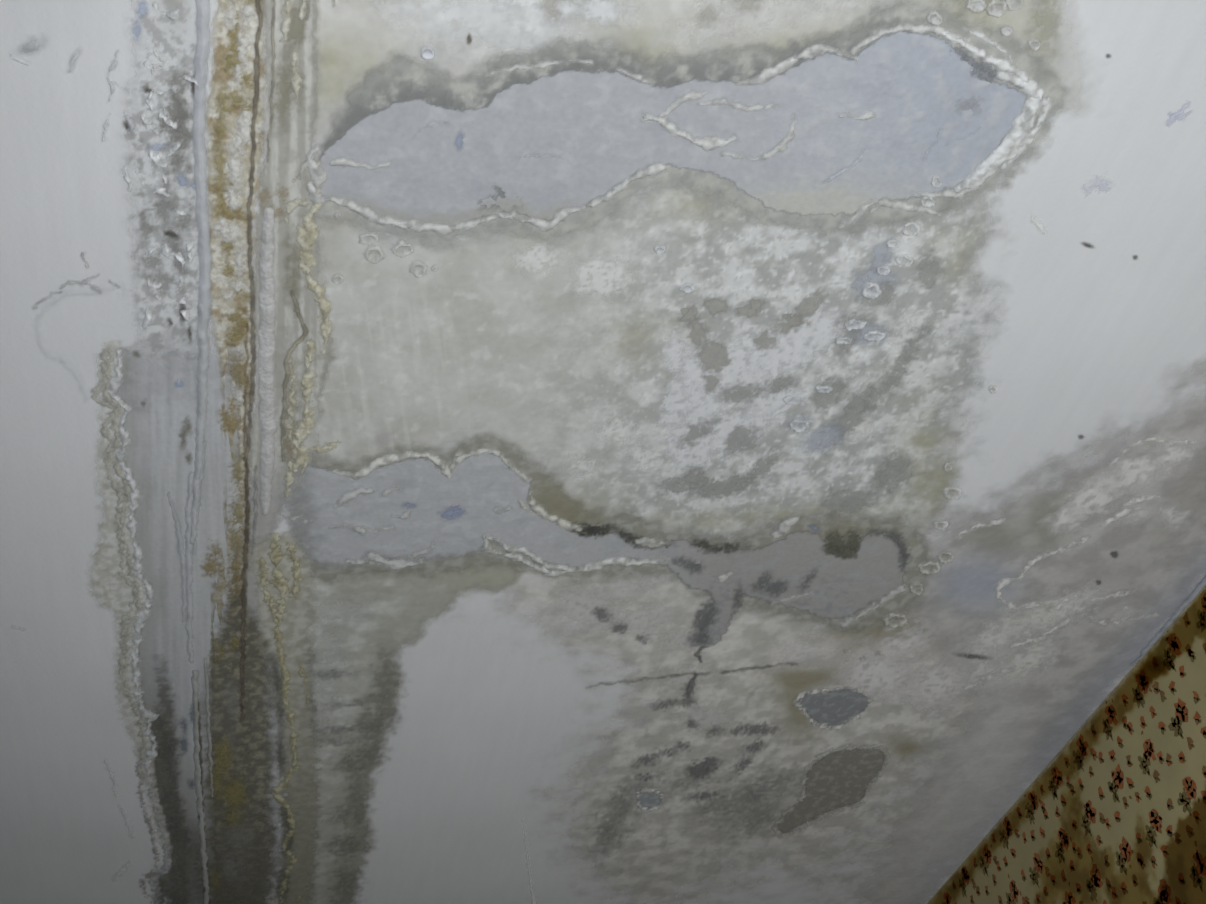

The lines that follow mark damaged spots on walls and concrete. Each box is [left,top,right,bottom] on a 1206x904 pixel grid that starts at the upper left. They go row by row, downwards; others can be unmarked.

peeling [91,0,241,904]
rust [202,0,265,699]
peeling [280,438,927,648]
damp [205,0,1074,904]
peeling [300,3,1066,240]
damp [858,398,1206,904]